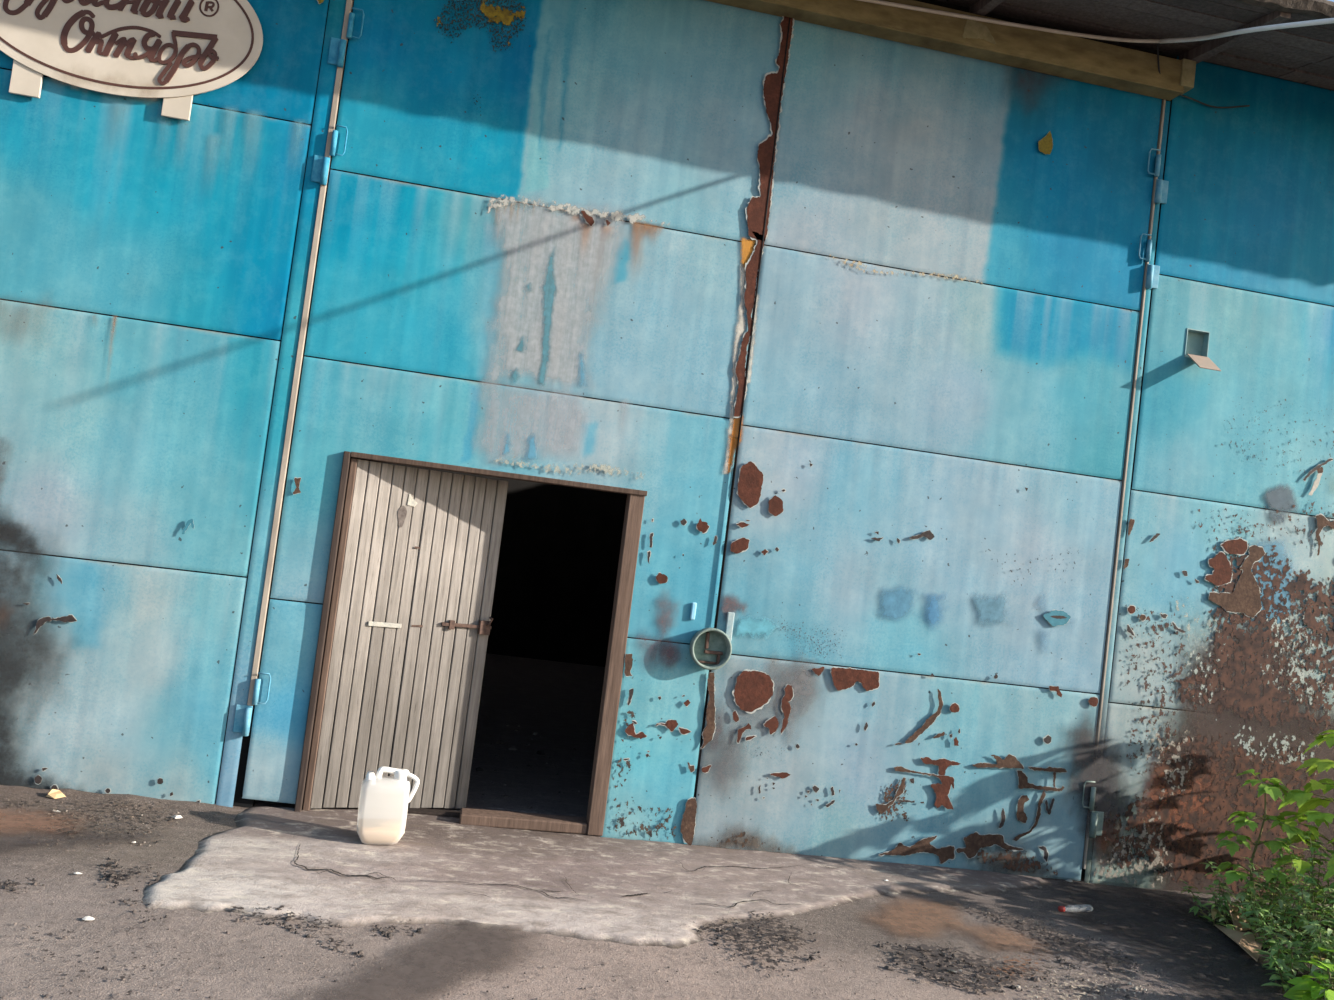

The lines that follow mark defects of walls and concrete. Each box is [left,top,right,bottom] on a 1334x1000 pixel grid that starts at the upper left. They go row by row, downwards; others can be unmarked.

peeling [434,0,526,52]
peeling [487,195,669,227]
peeling [733,16,795,418]
damp [0,519,51,789]
corrosion [1144,634,1334,901]